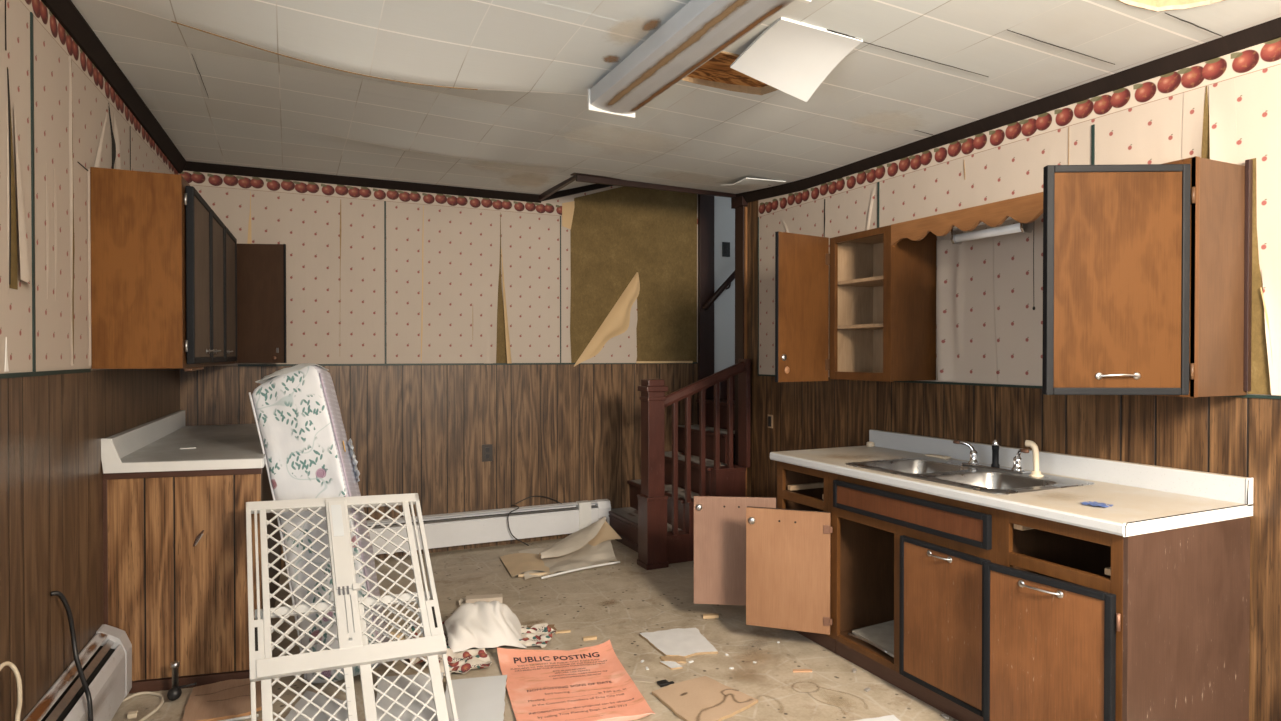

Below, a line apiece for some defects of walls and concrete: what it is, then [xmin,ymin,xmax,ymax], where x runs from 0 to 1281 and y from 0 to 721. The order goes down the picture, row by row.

damp [643,20,659,31]